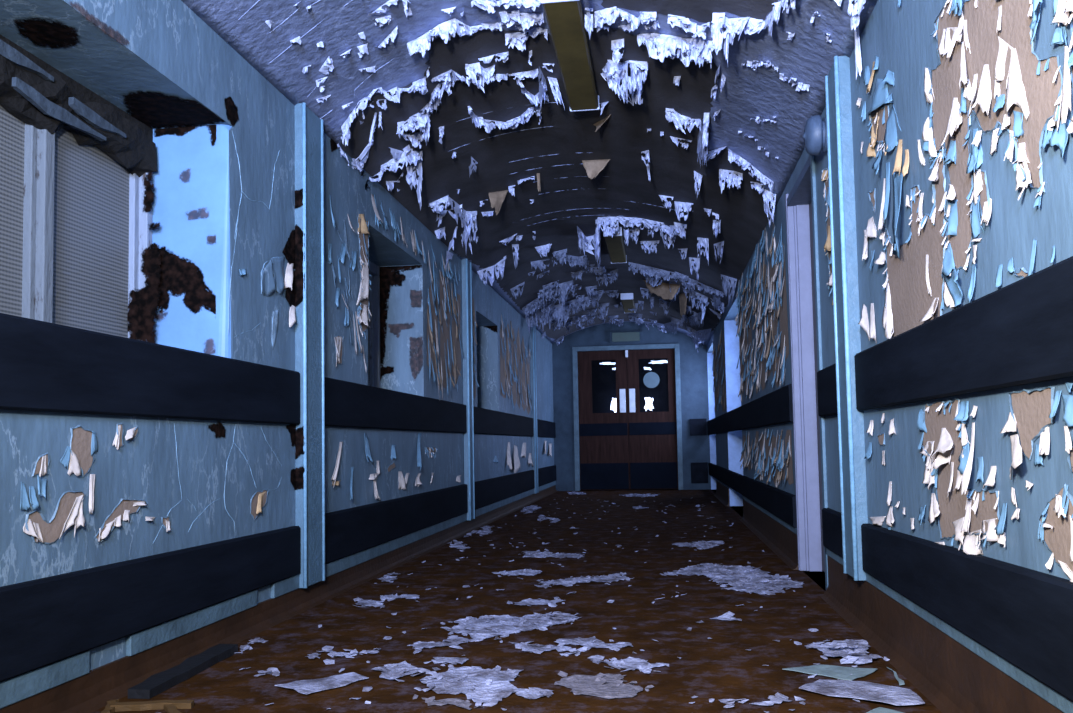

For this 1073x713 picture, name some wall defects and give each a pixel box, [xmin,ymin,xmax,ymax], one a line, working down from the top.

peeling [328,0,796,415]
peeling [834,0,1073,341]
spalling [282,224,305,315]
peeling [20,425,98,545]
peeling [113,423,138,450]
peeling [93,498,170,544]
spalling [286,424,305,490]
peeling [364,433,437,501]
peeling [740,428,794,488]
peeling [864,413,896,466]
peeling [869,382,1073,555]
peeling [1038,484,1073,582]